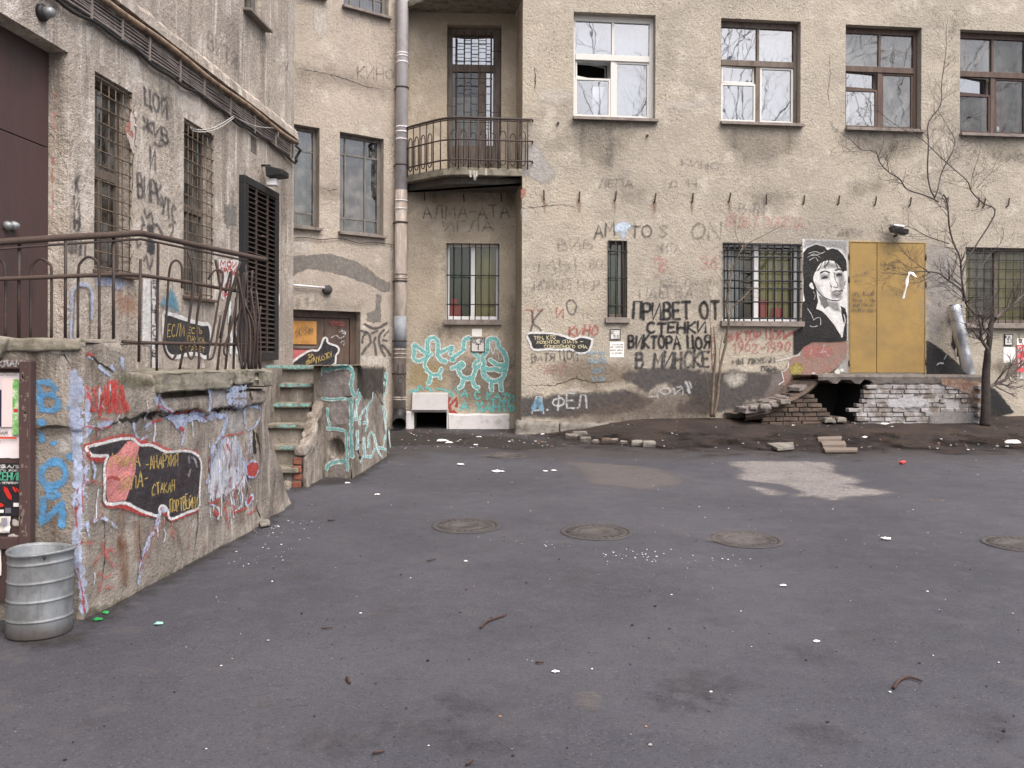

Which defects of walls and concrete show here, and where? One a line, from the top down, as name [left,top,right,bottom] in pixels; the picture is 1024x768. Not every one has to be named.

spalling [130,412,158,425]